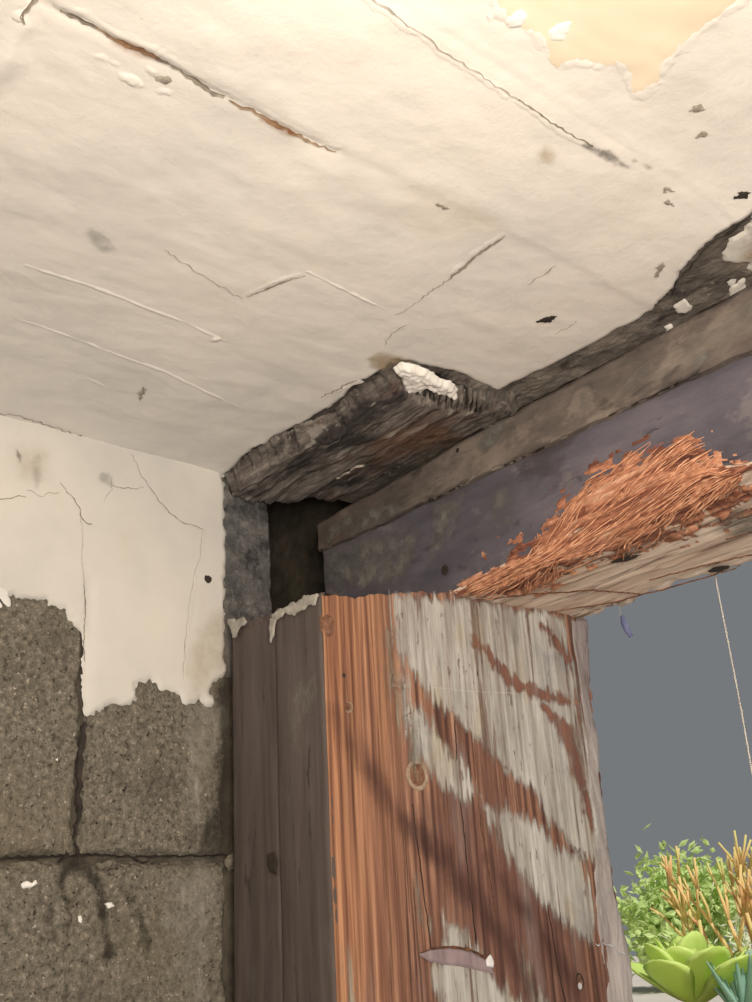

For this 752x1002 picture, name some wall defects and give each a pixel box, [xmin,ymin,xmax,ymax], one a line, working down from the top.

crack [10,0,342,152]
crack [363,0,607,156]
peeling [486,0,750,101]
crack [164,250,305,299]
spalling [224,213,752,505]
crack [0,482,90,662]
crack [0,721,227,864]
spalling [0,595,234,1002]
water stain [61,856,106,921]